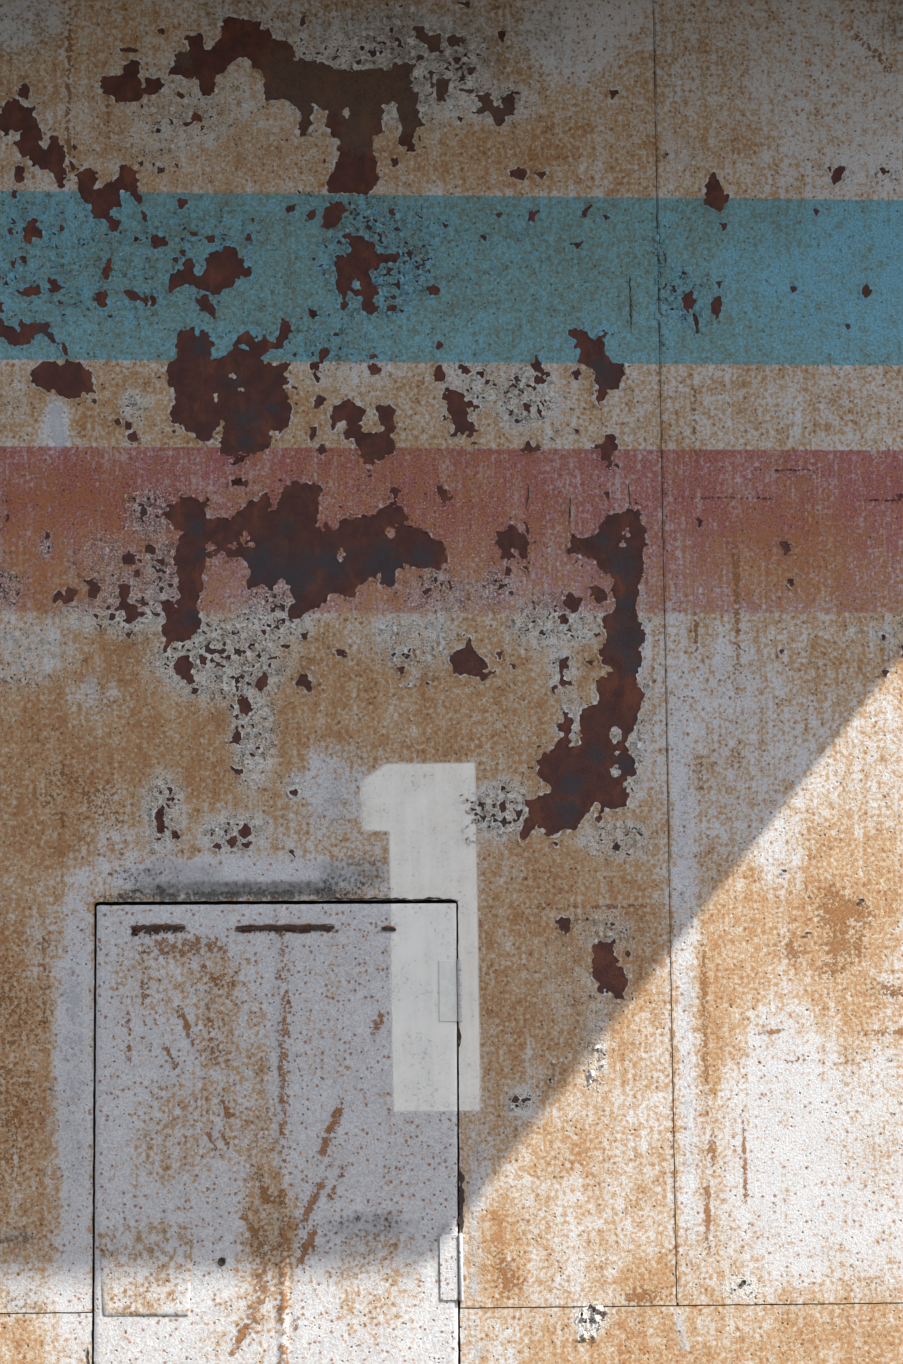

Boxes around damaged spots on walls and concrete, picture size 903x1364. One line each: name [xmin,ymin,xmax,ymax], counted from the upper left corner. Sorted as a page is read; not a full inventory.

peeling [0,8,523,696]
peeling [521,352,553,419]
peeling [564,325,630,409]
peeling [589,432,621,472]
peeling [490,490,659,852]
peeling [554,914,637,1003]
rust [775,883,876,979]
rust [0,937,49,1212]
rust [700,928,710,1116]
rust [238,924,338,1364]
rust [703,1134,717,1255]
rust [741,1110,749,1203]